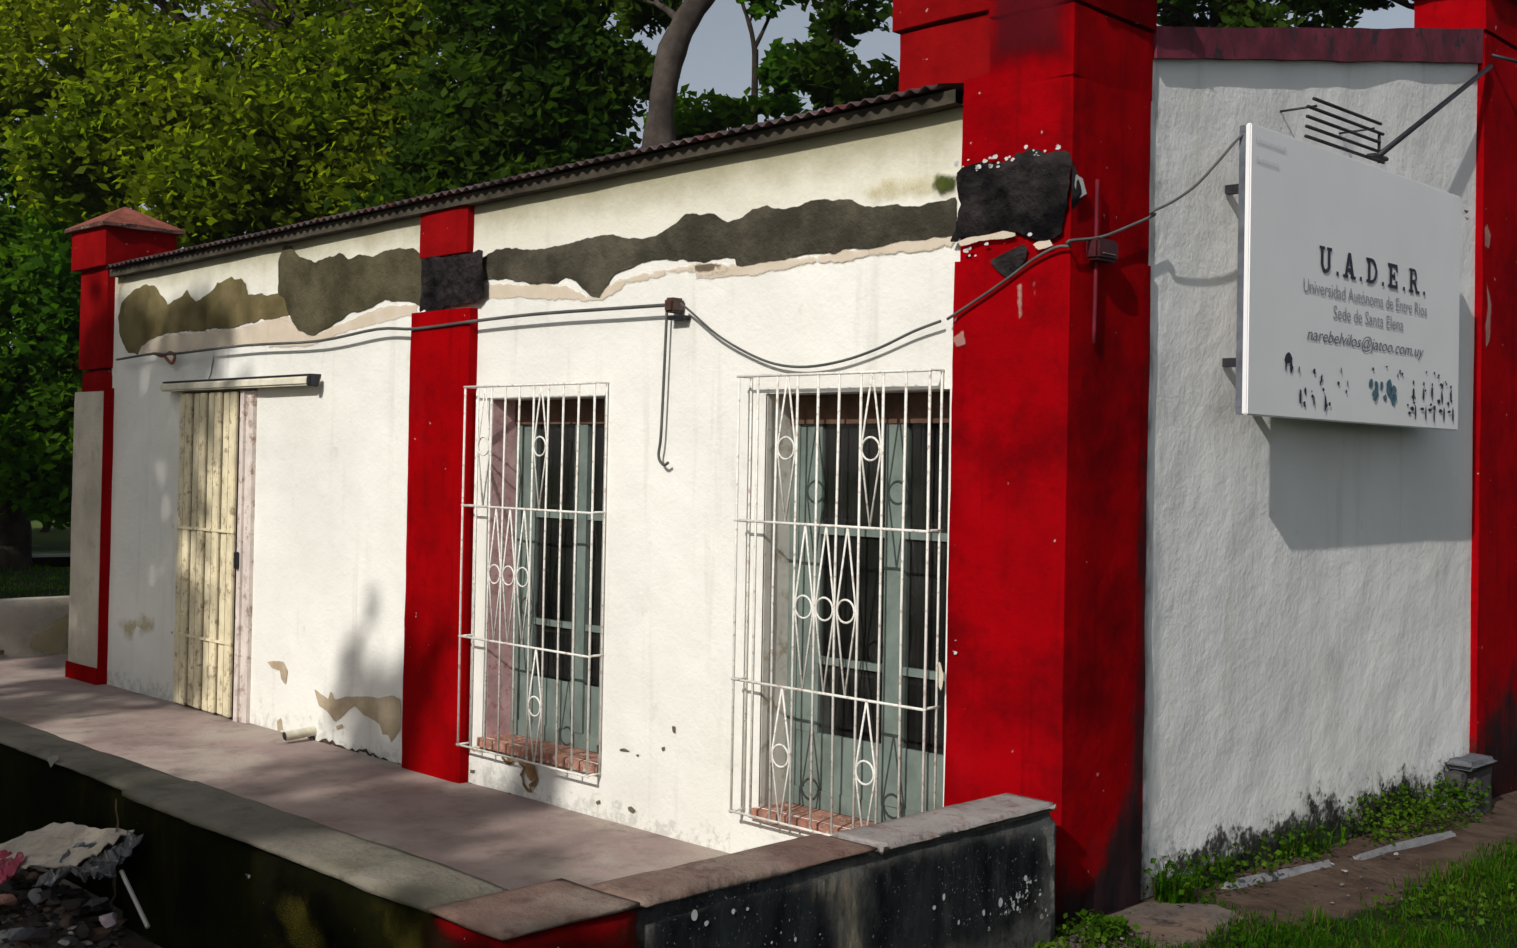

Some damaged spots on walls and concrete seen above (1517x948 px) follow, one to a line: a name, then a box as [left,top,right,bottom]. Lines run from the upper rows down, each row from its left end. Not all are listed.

spalling [118,144,1087,355]
peeling [315,690,401,741]
leakage [649,820,1142,948]